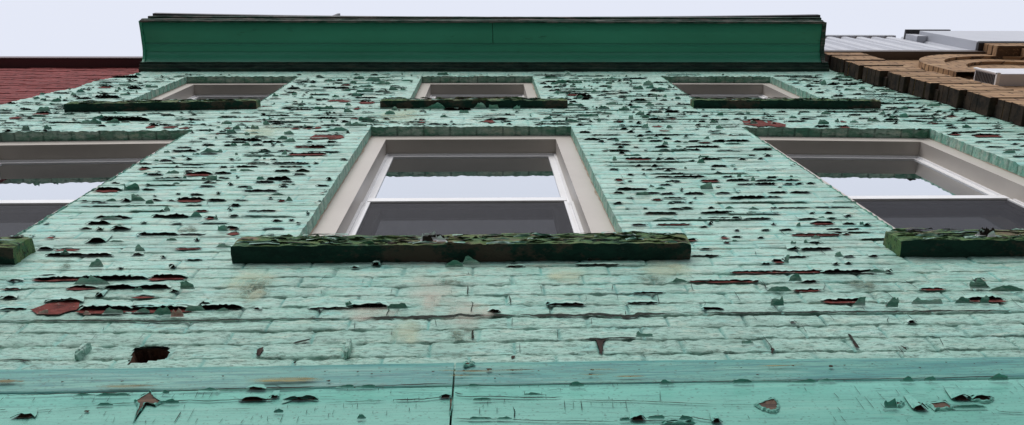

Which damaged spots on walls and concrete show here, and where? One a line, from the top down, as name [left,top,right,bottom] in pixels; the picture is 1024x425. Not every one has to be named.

peeling [0,72,1024,317]
spalling [128,348,170,365]
peeling [74,390,179,423]
peeling [753,397,780,413]
peeling [884,373,1009,411]